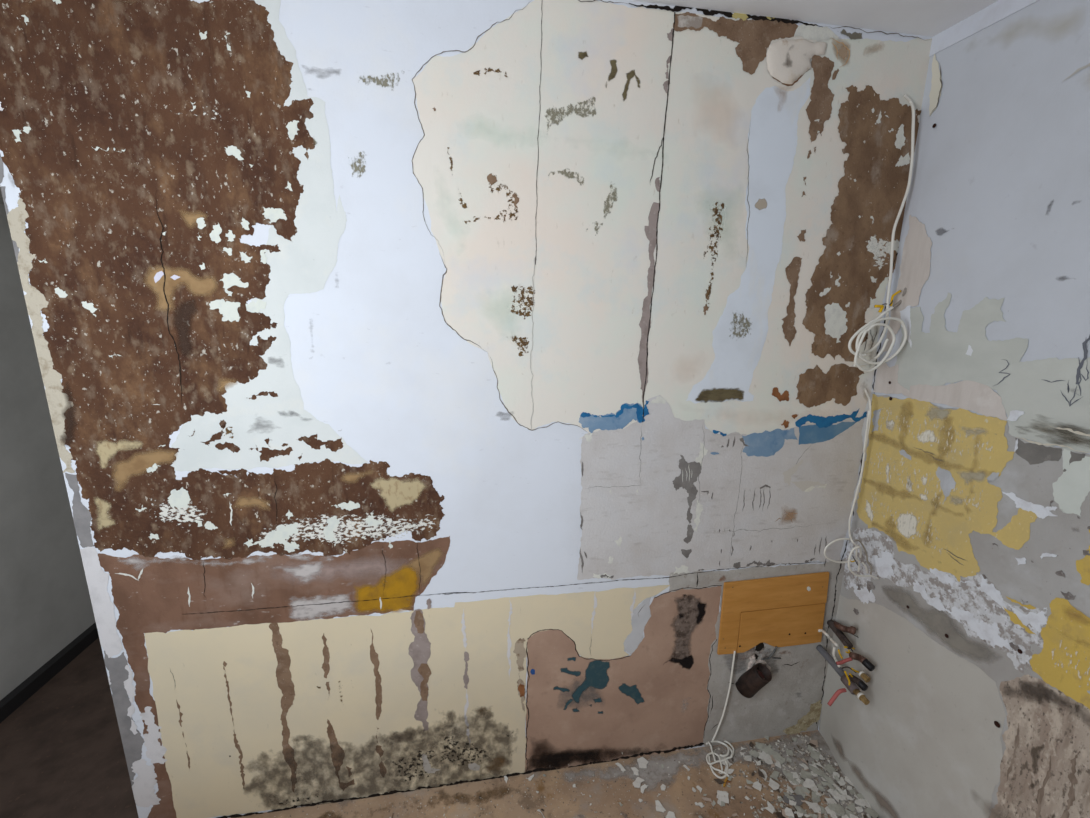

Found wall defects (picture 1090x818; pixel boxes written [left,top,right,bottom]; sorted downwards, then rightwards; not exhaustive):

flaking render [0,0,450,818]
peeling [412,0,1090,761]
damp [669,595,706,669]
damp [223,598,513,806]
damp [531,744,623,768]
flaking render [615,757,676,818]
flaking render [678,759,716,808]
flaking render [812,747,878,818]
damp [853,767,898,818]
damp [1031,747,1080,818]